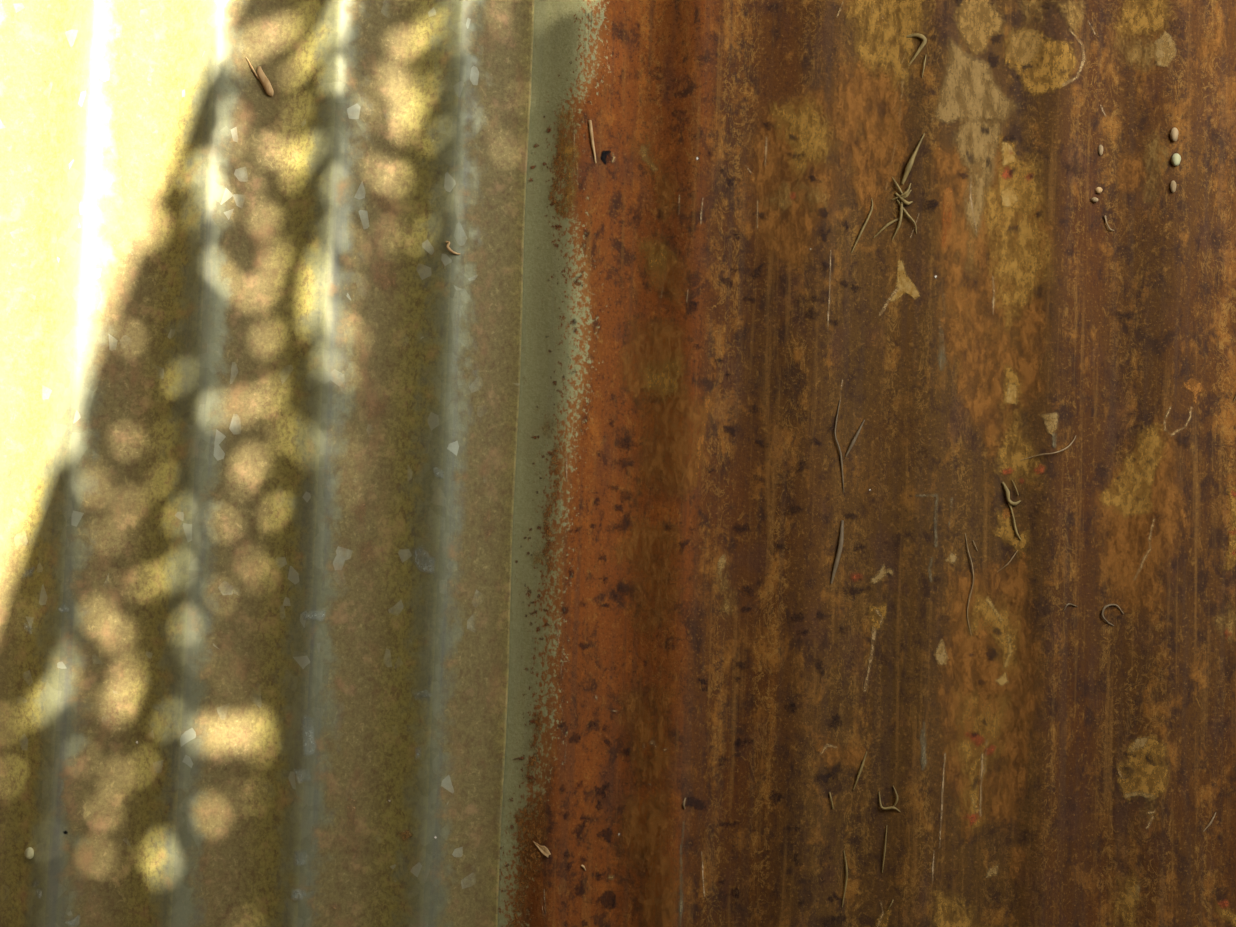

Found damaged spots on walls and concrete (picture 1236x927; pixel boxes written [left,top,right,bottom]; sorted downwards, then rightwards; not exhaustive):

rust [498,0,1236,927]